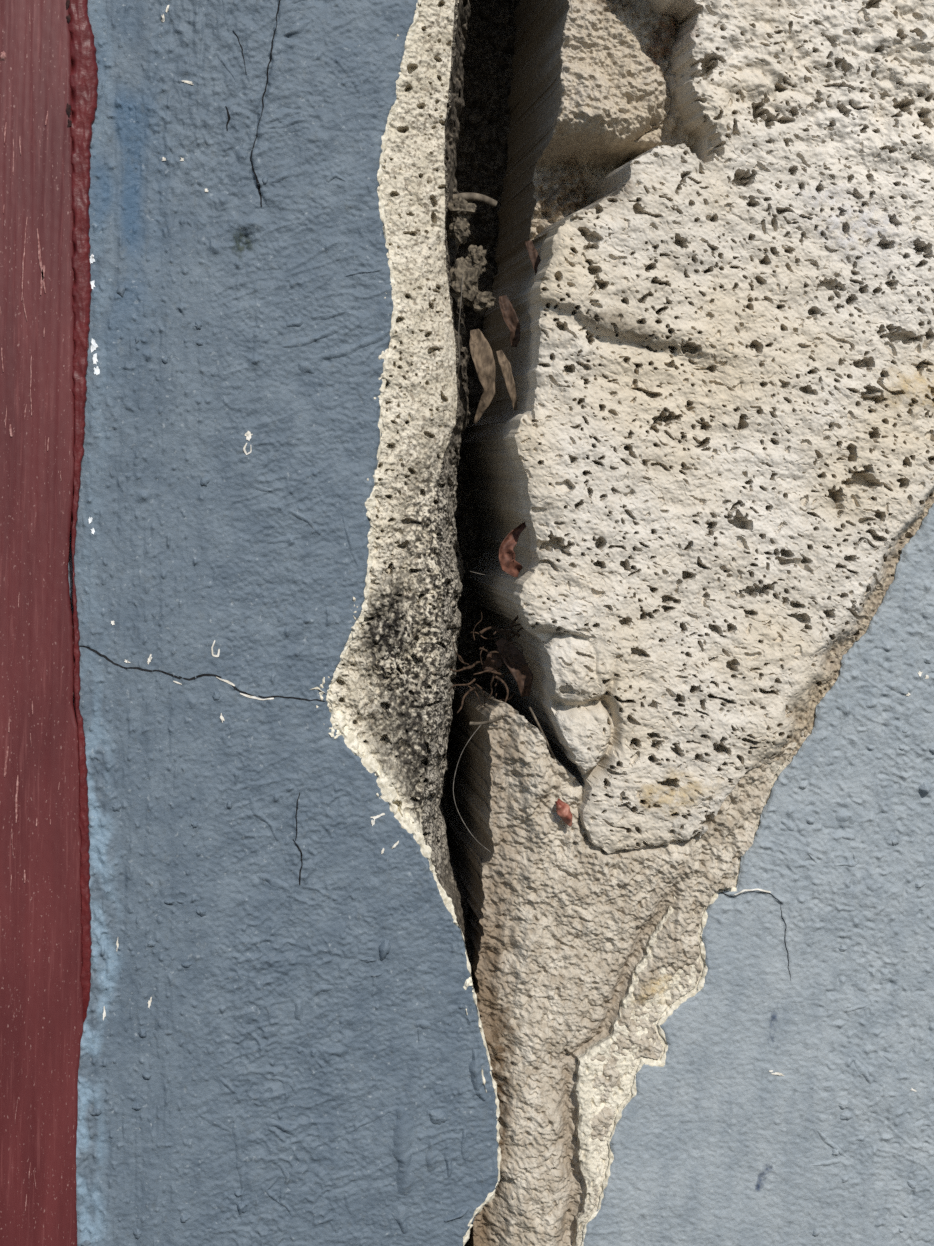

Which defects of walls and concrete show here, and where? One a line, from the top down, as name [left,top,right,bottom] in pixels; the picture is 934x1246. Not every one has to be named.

crack [79,0,520,1077]
spalling [310,0,934,1246]
crack [721,889,791,978]